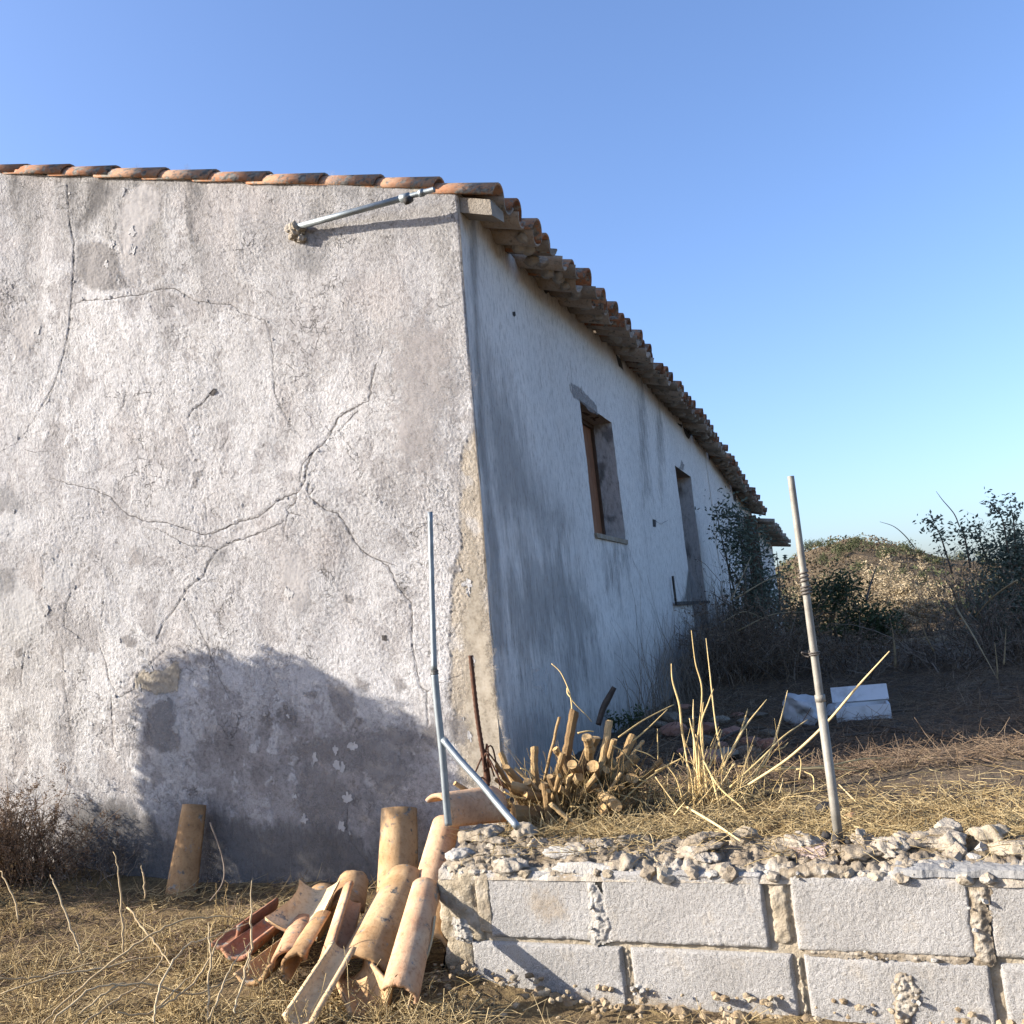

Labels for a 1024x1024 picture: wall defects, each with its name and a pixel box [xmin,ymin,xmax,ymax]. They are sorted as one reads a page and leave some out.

crack [0,185,463,739]
peeling [135,662,180,752]
peeling [419,542,505,789]
leakage [685,572,693,601]